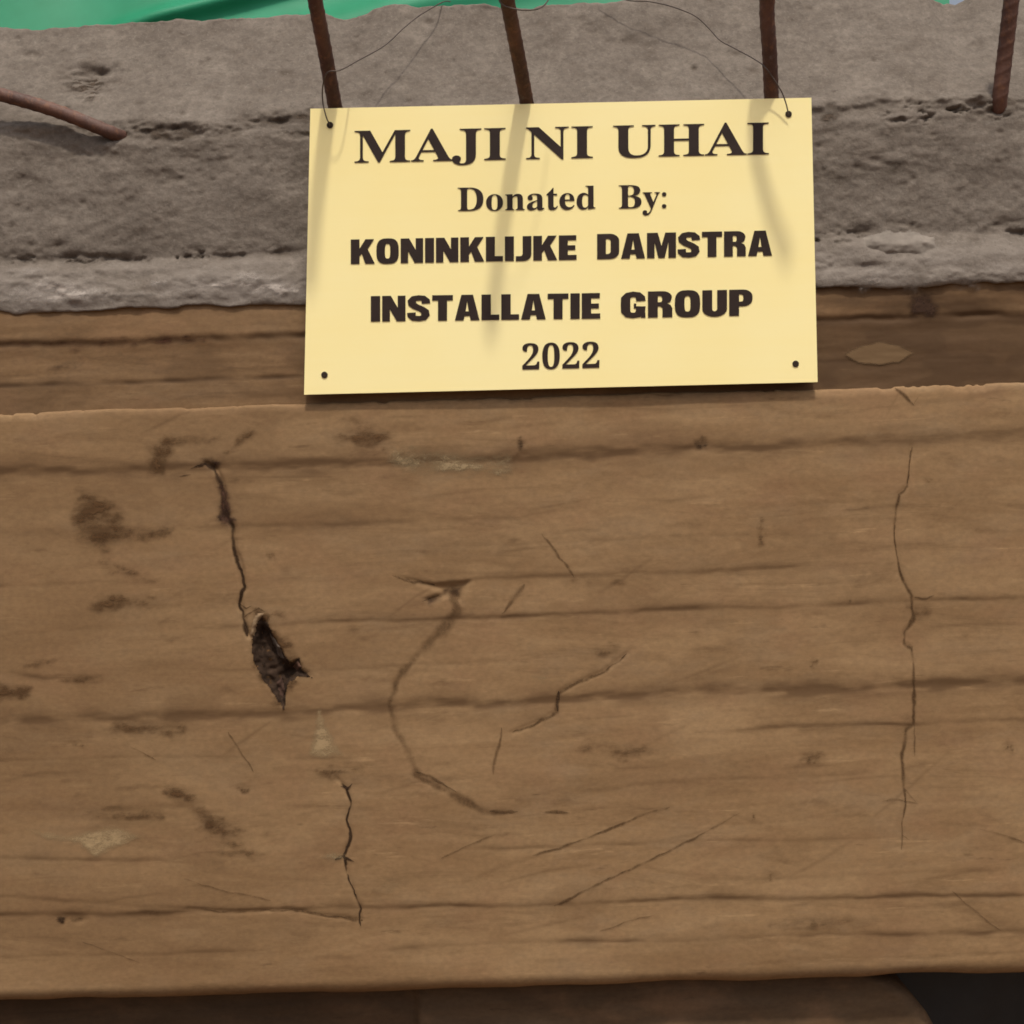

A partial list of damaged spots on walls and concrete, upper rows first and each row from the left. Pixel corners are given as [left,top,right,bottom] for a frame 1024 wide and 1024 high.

crack [179,463,263,636]
crack [496,654,626,754]
crack [894,450,934,850]
crack [203,784,363,926]
crack [414,771,514,813]